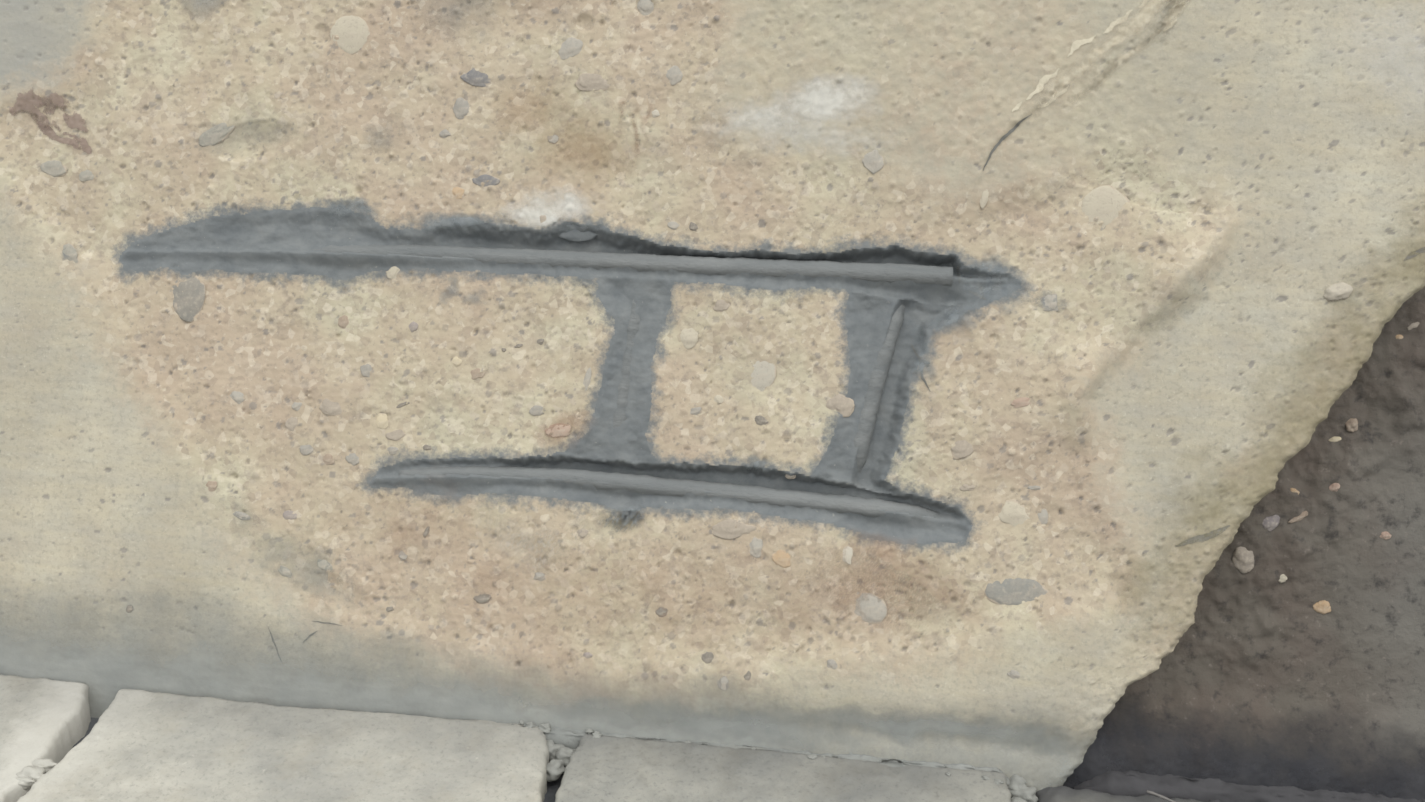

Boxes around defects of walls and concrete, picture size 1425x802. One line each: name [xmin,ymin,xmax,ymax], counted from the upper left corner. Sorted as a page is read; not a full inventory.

crack [969,0,1186,199]
spalling [0,0,1221,691]
spalling [1175,525,1230,547]